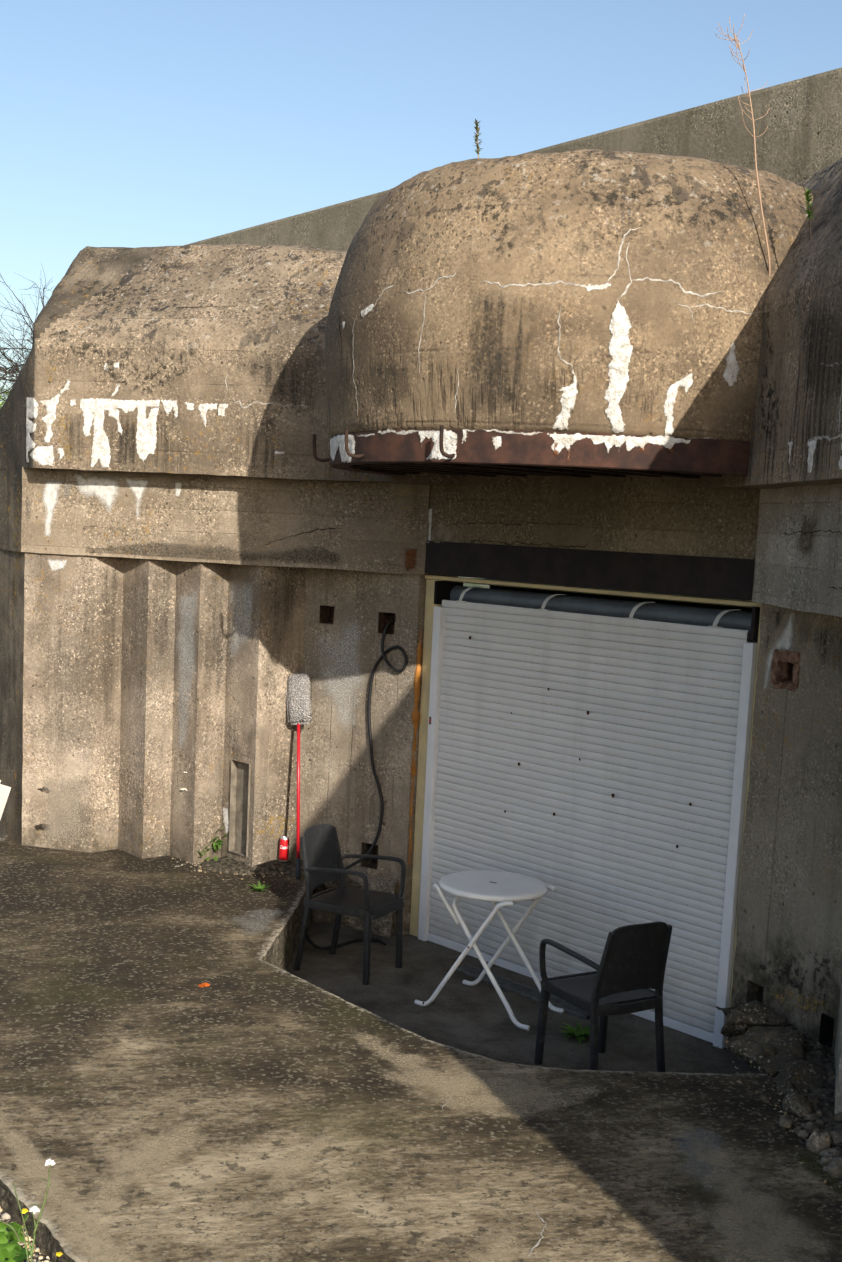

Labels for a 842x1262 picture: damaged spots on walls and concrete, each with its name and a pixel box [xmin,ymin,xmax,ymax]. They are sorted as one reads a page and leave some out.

leakage [330,298,714,463]
crack [339,226,767,416]
leakage [760,319,842,473]
leakage [91,544,339,563]